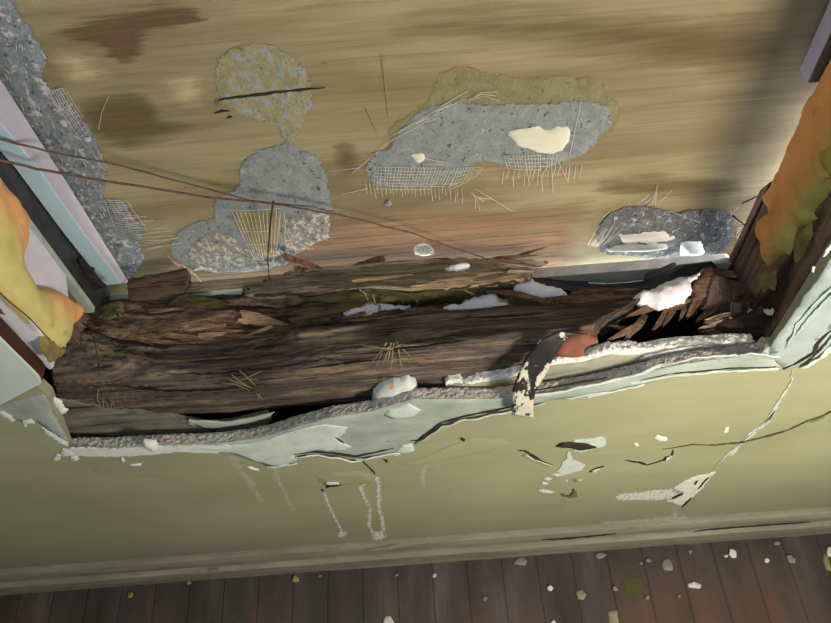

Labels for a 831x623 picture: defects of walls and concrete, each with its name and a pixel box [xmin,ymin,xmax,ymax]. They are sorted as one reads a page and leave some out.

peeling [57,57,98,81]
leakage [62,9,203,62]
peeling [533,258,831,409]
peeling [0,365,521,471]
crack [625,370,831,471]
peeling [538,436,606,499]
leakage [323,492,346,538]
leakage [358,477,387,550]